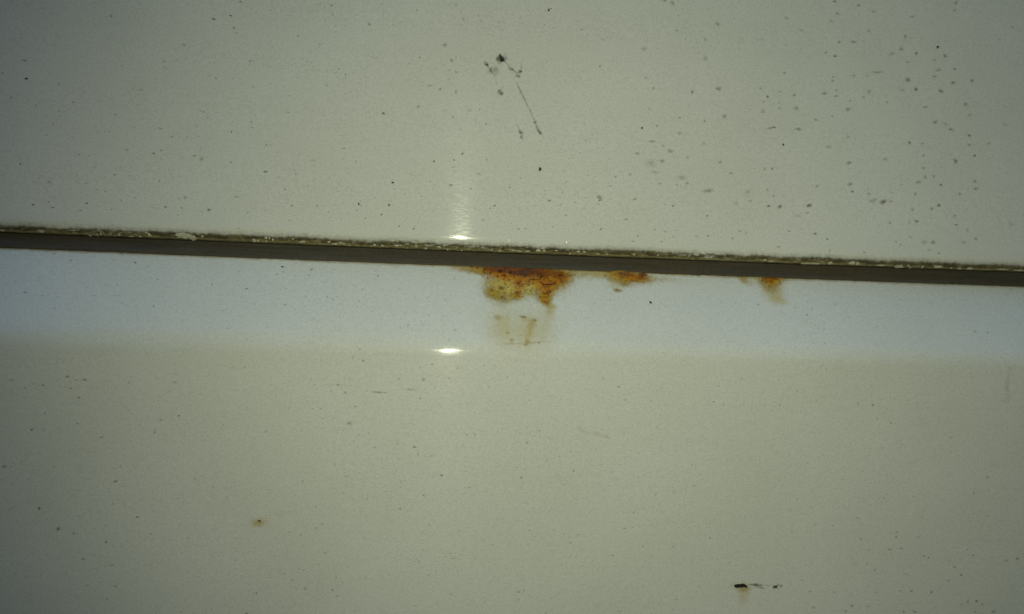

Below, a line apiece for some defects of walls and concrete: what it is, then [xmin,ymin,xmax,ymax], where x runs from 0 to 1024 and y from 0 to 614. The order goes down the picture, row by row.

rust [462,266,574,308]
rust [592,270,652,291]
rust [740,277,784,300]